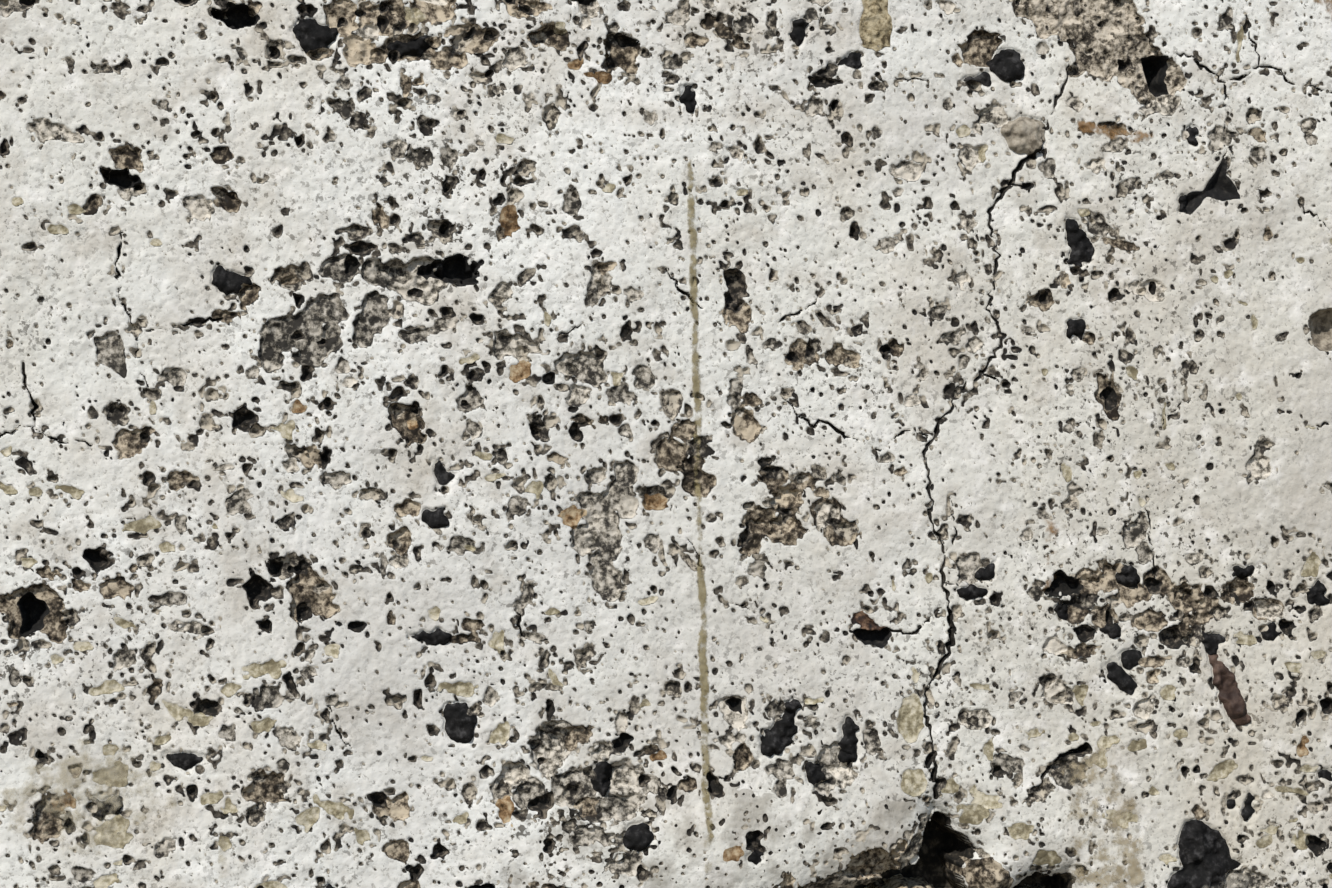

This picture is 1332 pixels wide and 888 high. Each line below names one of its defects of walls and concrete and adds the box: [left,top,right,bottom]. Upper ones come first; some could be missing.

spalling [68,0,168,30]
crack [1176,27,1332,157]
spalling [1292,58,1332,98]
spalling [22,242,44,251]
spalling [162,235,202,256]
spalling [260,207,290,245]
spalling [1274,370,1321,434]
spalling [0,392,67,455]
crack [779,46,1076,799]
spalling [426,724,443,745]
crack [1038,745,1083,787]
crack [469,880,495,888]